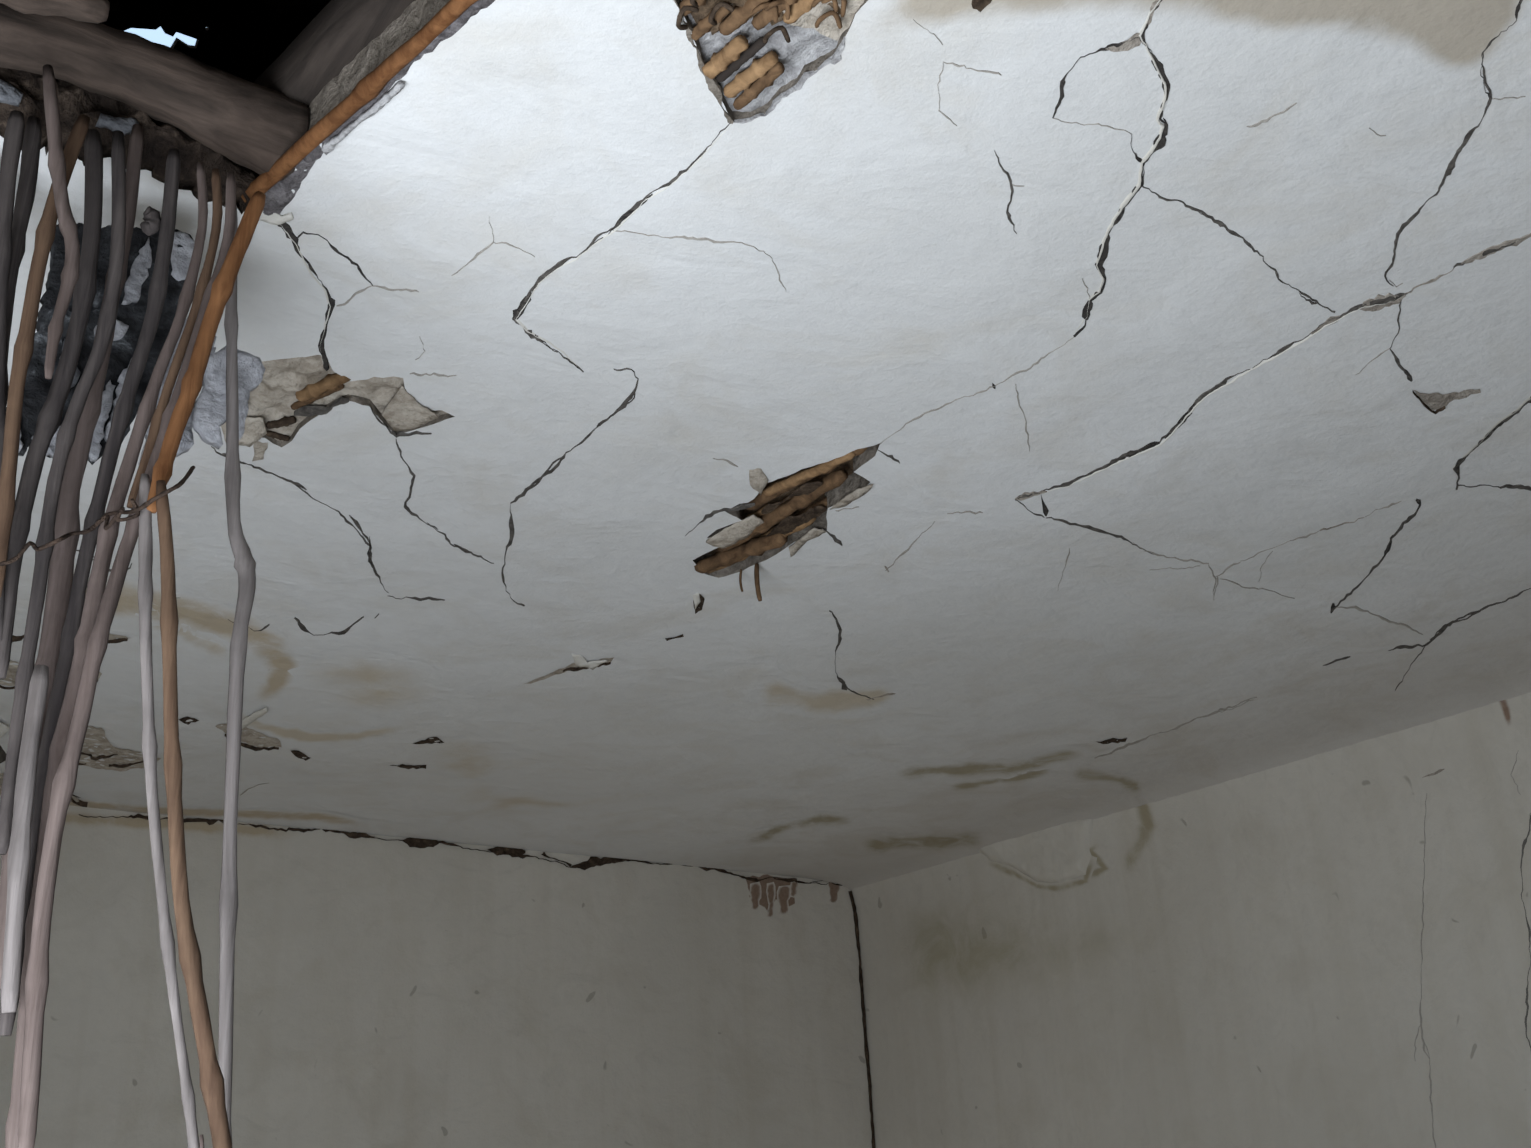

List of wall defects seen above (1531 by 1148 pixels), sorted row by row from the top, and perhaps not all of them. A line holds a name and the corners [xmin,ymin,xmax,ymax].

spalling [674,0,864,124]
leakage [855,0,1531,77]
spalling [221,355,447,461]
crack [277,222,419,371]
crack [396,123,786,606]
crack [880,0,1531,691]
spalling [685,447,900,601]
leakage [74,559,453,744]
peeling [79,726,161,772]
crack [79,783,876,1148]
corrosion [746,874,799,918]
leakage [883,744,1167,1032]